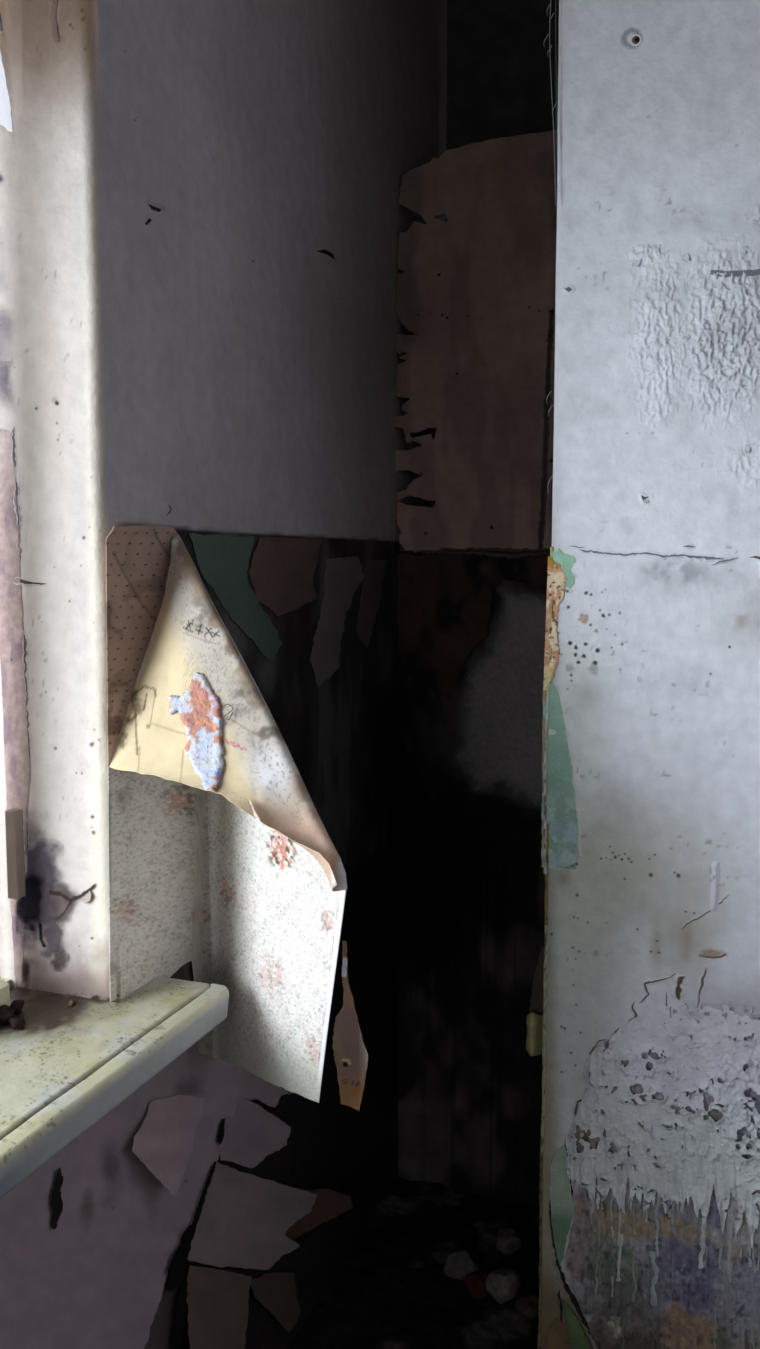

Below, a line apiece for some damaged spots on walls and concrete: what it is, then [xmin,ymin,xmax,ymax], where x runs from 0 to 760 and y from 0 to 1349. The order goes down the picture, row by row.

crack [570,543,760,579]
peeling [90,525,347,1103]
water stain [15,840,95,970]
crack [680,893,731,930]
peeling [565,1000,760,1349]